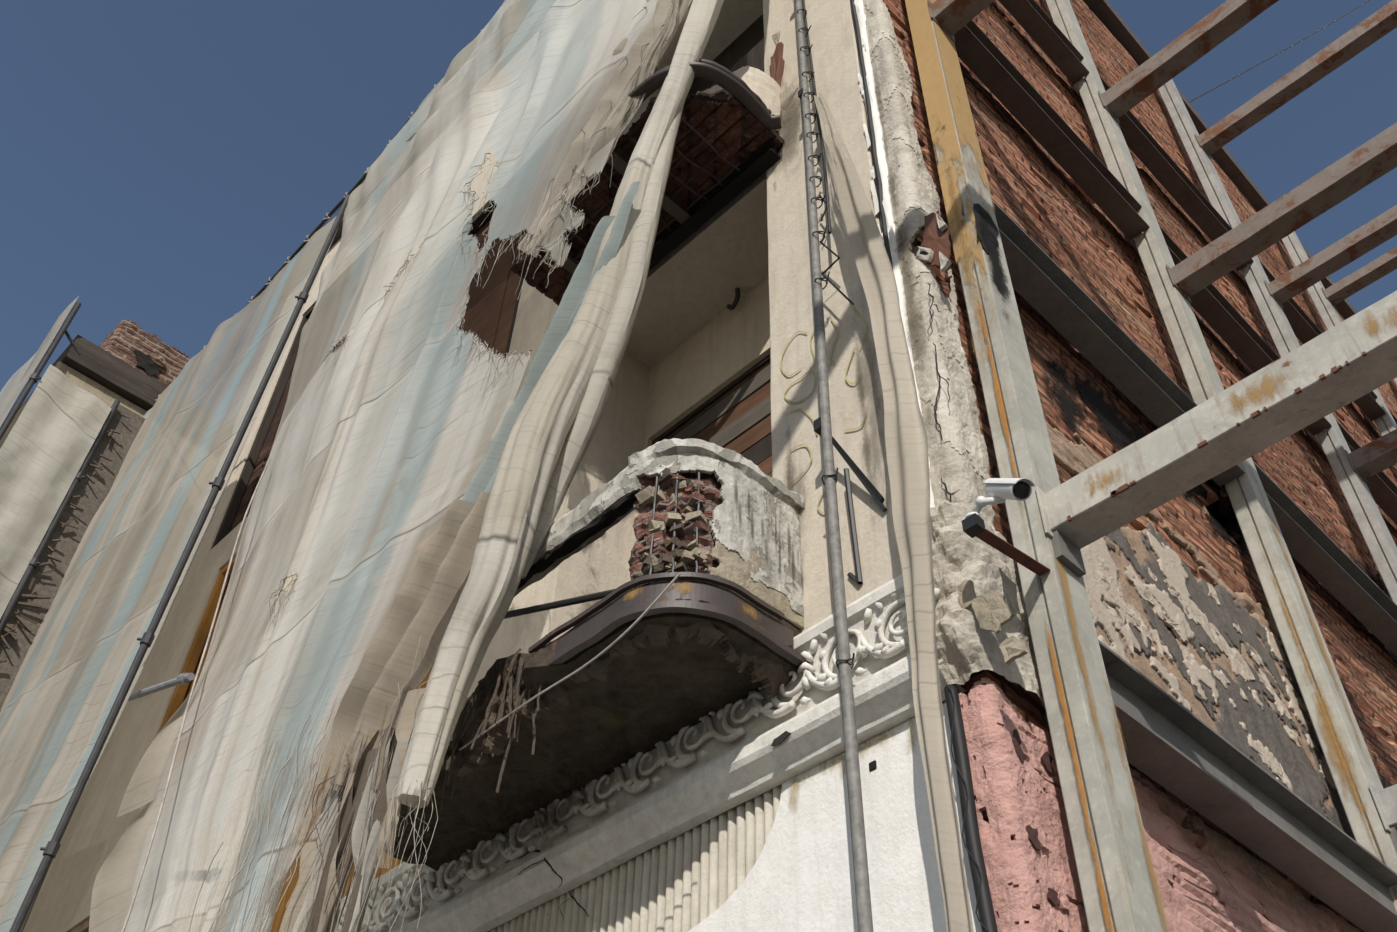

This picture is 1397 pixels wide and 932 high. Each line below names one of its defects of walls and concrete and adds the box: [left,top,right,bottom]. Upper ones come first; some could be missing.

peeling [854,0,952,297]
corrosion [905,0,1018,478]
crack [927,283,950,440]
peeling [910,298,985,481]
corrosion [1232,377,1281,407]
spalling [635,468,709,574]
crack [941,477,959,502]
peeling [957,567,1028,665]
corrosion [1058,559,1122,752]
peeling [1080,511,1356,841]
corrosion [1045,623,1113,932]
corrosion [1137,814,1169,932]